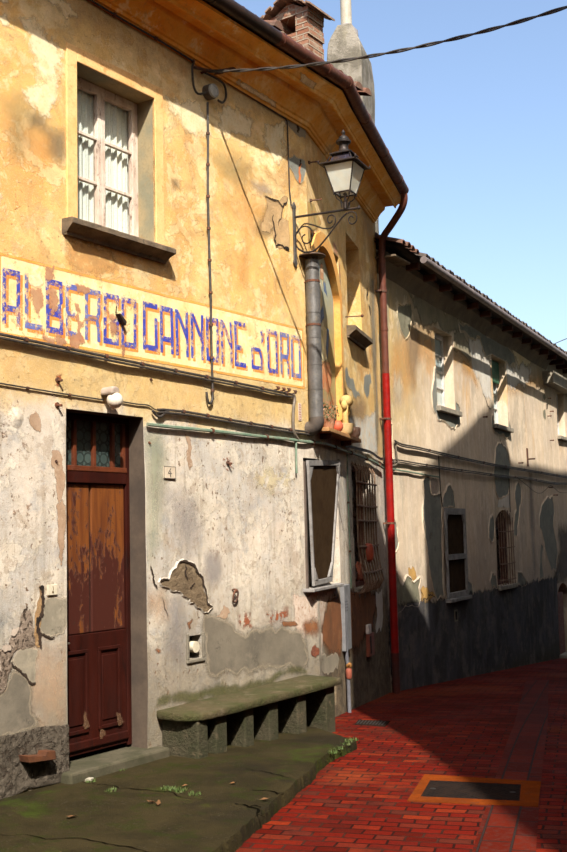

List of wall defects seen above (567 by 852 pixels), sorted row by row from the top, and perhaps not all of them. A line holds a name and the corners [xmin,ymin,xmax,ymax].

spalling [258,196,290,251]
peeling [29,266,59,317]
peeling [42,303,97,349]
peeling [506,350,531,390]
peeling [29,412,41,432]
peeling [51,450,66,565]
spalling [421,510,436,602]
spalling [158,559,230,619]
crack [23,585,55,649]
spalling [0,611,35,694]
crack [11,662,36,685]